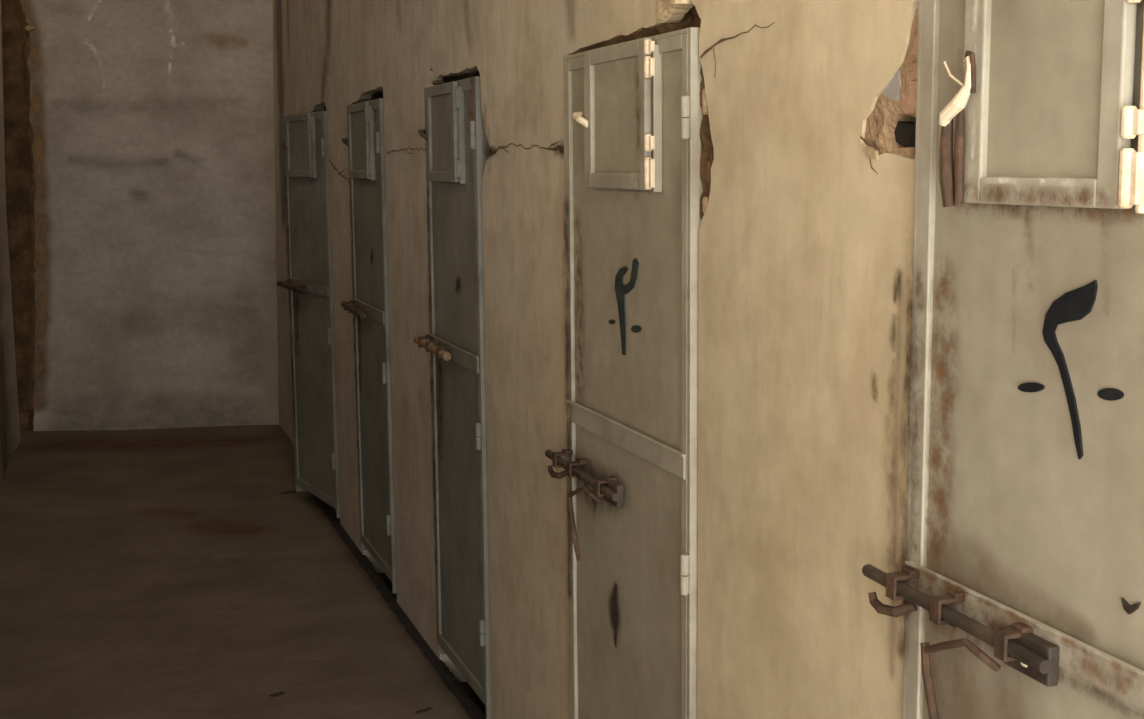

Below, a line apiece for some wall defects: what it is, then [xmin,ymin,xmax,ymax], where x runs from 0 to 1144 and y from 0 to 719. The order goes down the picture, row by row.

peeling [1,0,49,431]
crack [487,141,563,155]
spalling [699,66,714,220]
crack [700,22,775,71]
spalling [860,9,918,174]
corrosion [893,275,922,400]
corrosion [930,334,953,557]